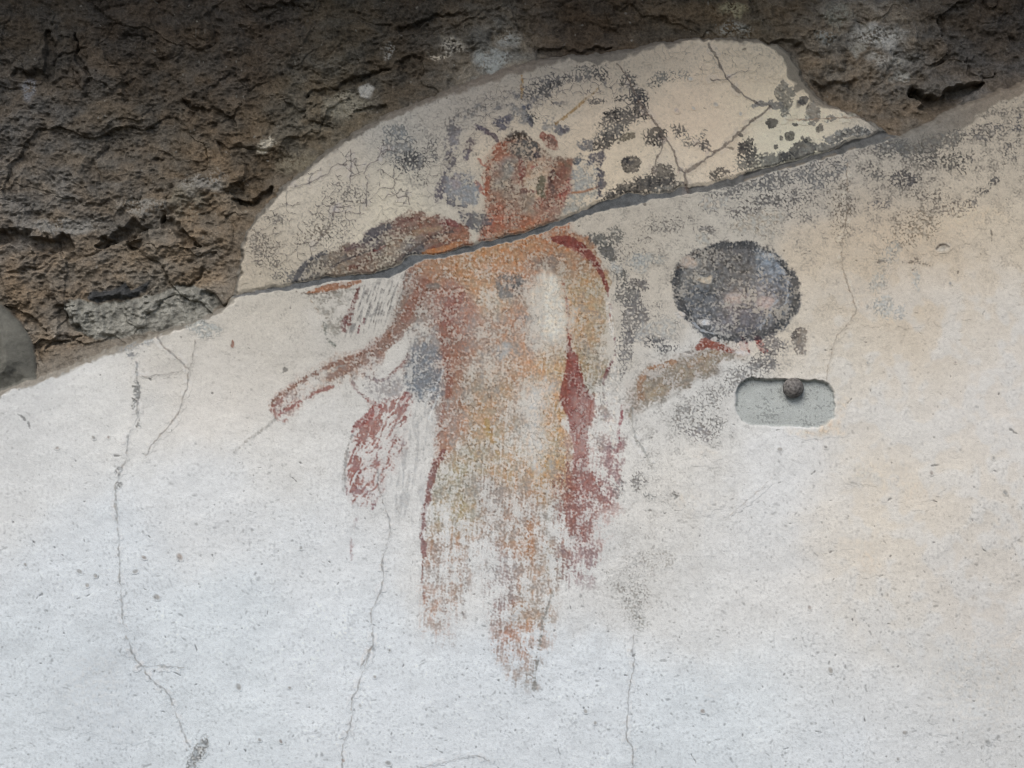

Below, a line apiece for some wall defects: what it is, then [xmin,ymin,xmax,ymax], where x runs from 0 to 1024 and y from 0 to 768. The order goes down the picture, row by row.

spalling [0,228,75,256]
spalling [95,217,202,251]
spalling [231,186,274,212]
crack [240,39,860,296]
water stain [512,60,712,202]
water stain [581,78,1024,335]
crack [822,159,861,382]
spalling [907,82,985,114]
peeling [131,377,142,432]
spalling [736,380,835,429]
crack [110,333,200,751]
crack [335,466,396,768]